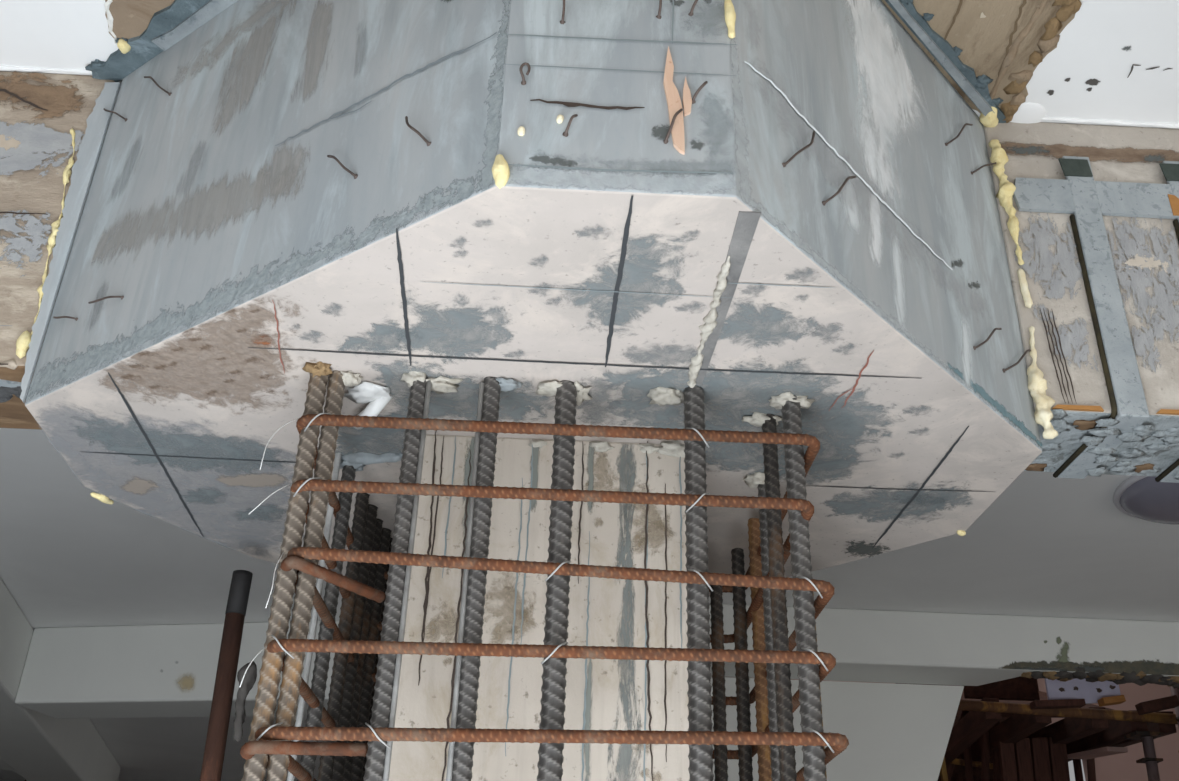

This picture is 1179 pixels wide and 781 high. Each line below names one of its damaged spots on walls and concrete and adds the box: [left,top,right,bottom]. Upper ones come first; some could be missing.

peeling [104,0,174,44]
peeling [882,0,982,114]
peeling [913,0,1082,123]
peeling [0,71,86,183]
water stain [843,0,920,323]
peeling [0,209,52,277]
water stain [335,296,523,455]
water stain [554,231,699,331]
water stain [579,346,927,484]
water stain [718,285,839,346]
water stain [43,409,296,554]
water stain [586,442,671,730]